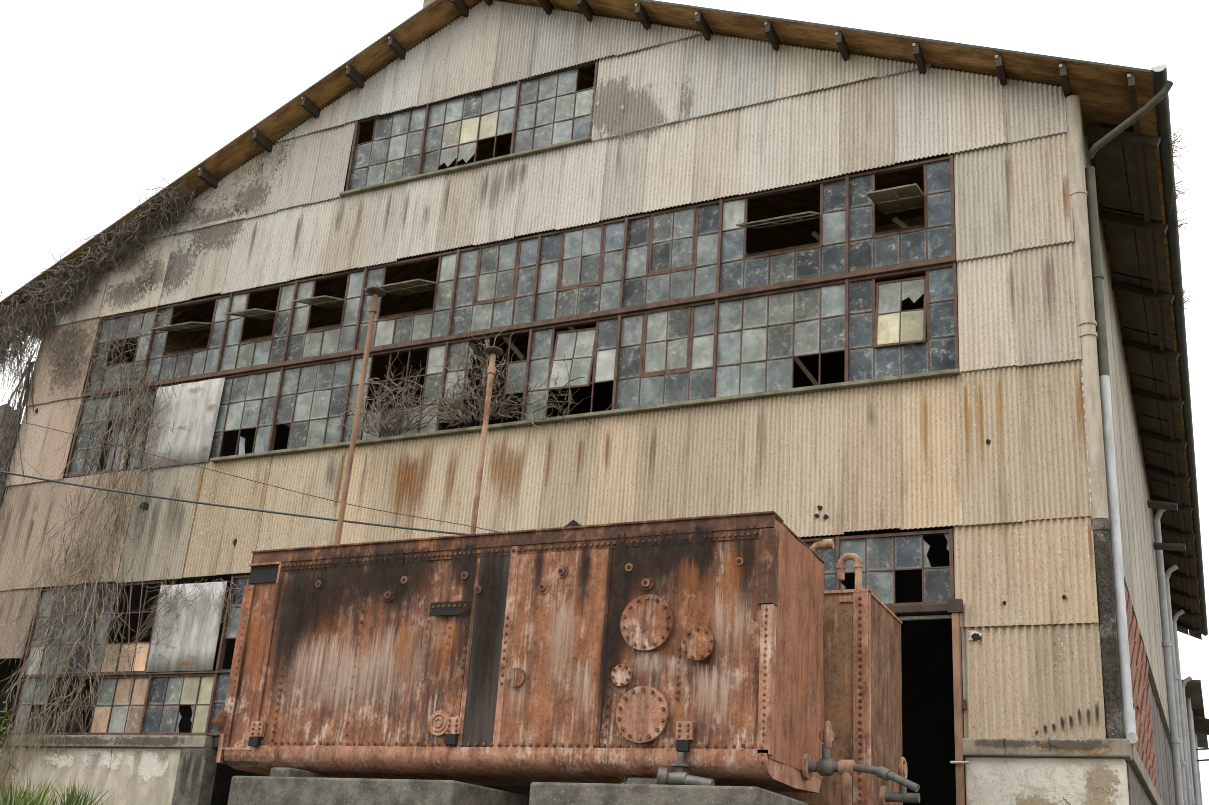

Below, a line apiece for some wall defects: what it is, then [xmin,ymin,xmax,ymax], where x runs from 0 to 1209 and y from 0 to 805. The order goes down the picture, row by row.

rust [395,445,430,515]
peeling [969,740,1121,805]